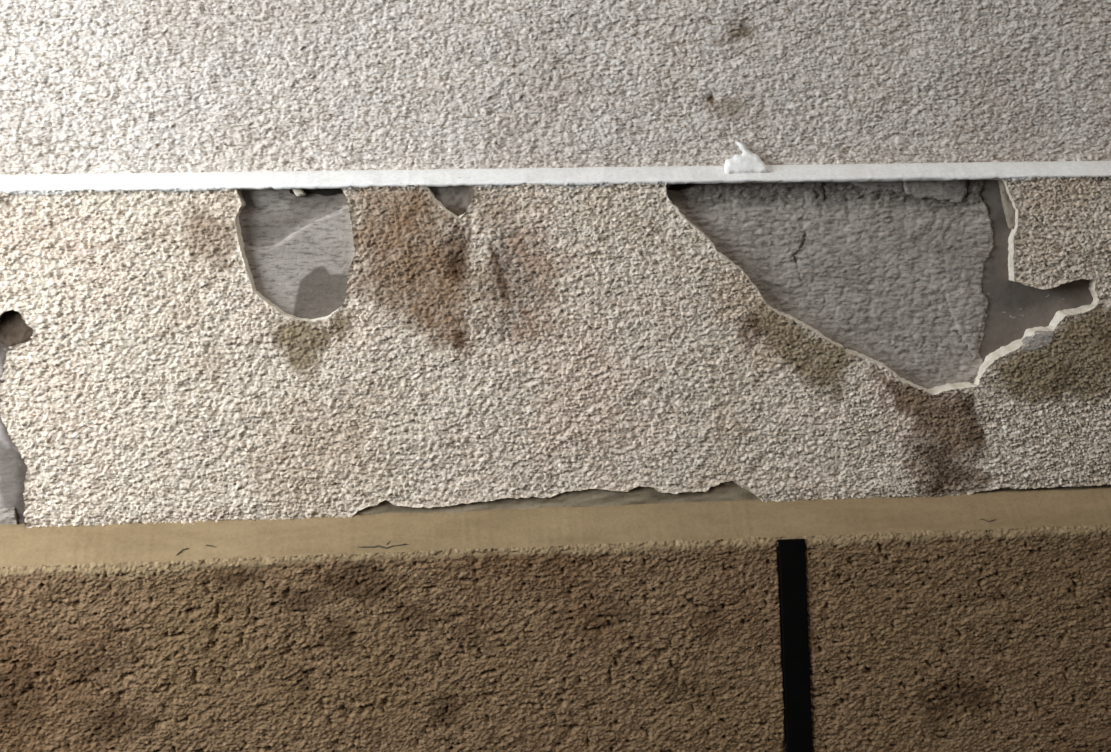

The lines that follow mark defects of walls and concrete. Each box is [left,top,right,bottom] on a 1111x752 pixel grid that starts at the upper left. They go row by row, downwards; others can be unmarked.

flaking render [425,177,475,218]
flaking render [235,188,356,322]
water stain [353,188,465,348]
flaking render [664,178,1099,396]
flaking render [0,310,33,379]
flaking render [0,417,27,525]
flaking render [354,480,763,515]
water stain [885,381,984,491]